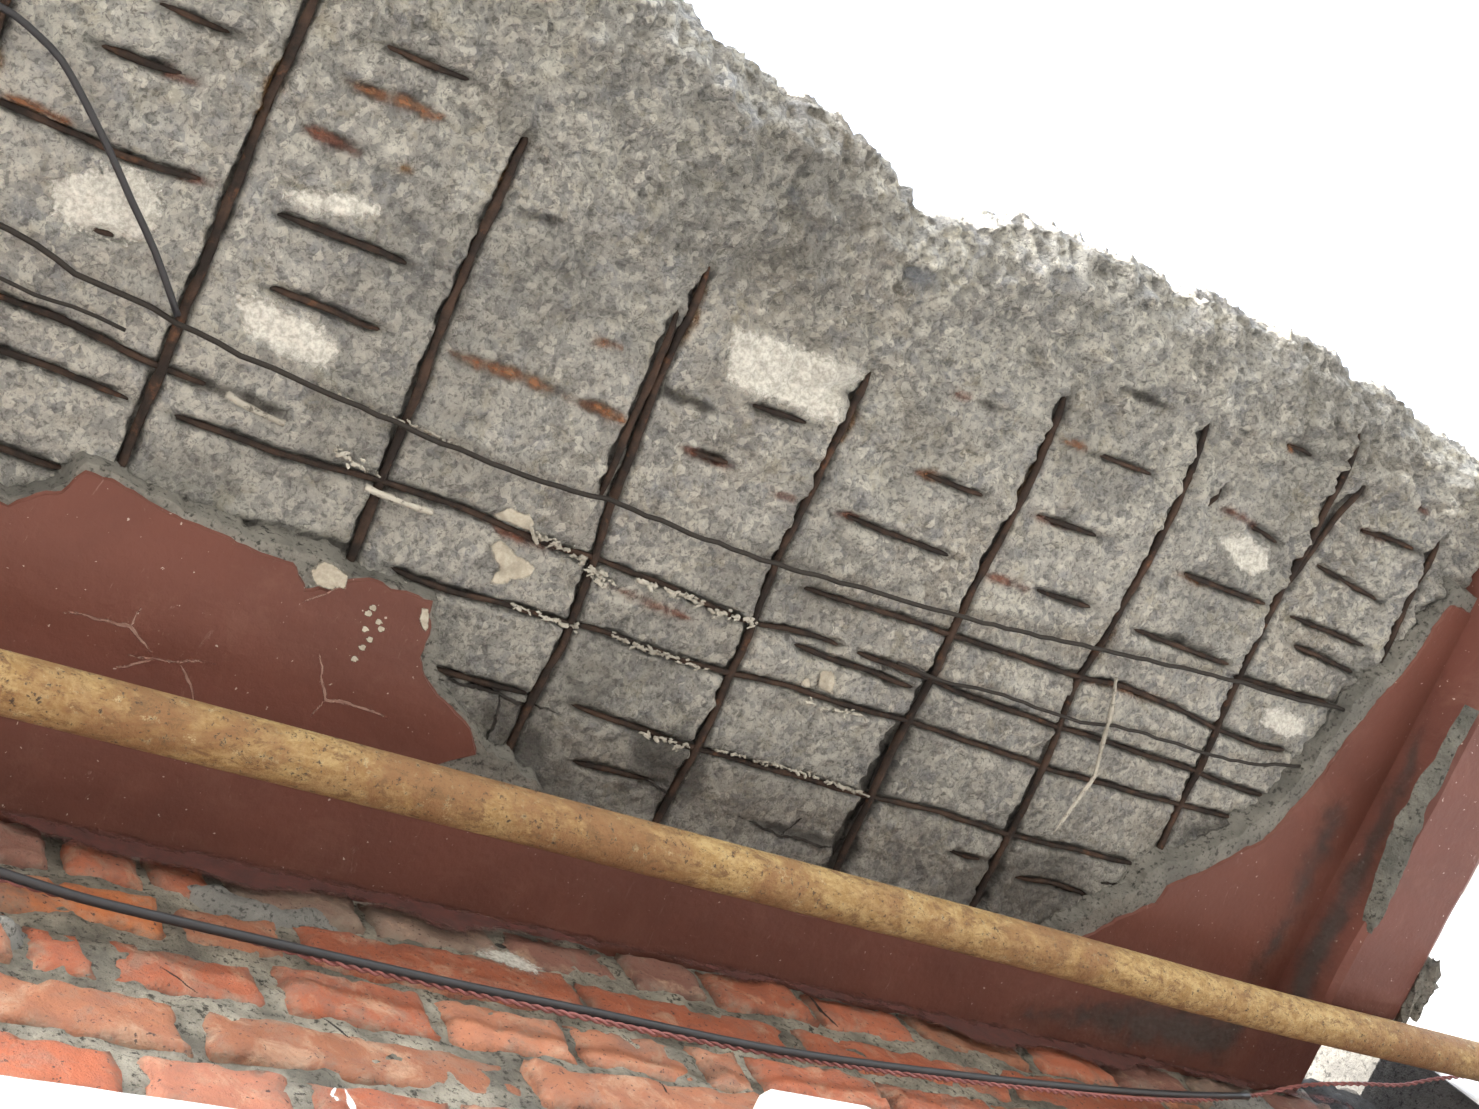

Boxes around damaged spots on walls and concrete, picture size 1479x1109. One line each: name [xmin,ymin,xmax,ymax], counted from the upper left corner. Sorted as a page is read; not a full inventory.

corrosion [4,95,70,125]
corrosion [355,85,443,120]
corrosion [304,126,355,151]
spalling [0,0,308,487]
corrosion [462,356,552,390]
corrosion [581,401,626,424]
corrosion [685,447,727,468]
spalling [127,0,1479,934]
corrosion [493,525,544,548]
corrosion [985,573,1029,590]
corrosion [621,590,689,619]